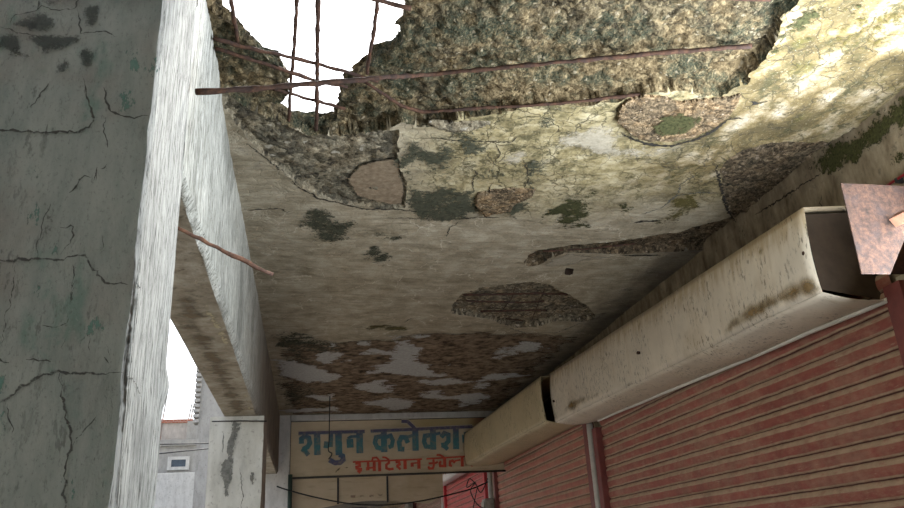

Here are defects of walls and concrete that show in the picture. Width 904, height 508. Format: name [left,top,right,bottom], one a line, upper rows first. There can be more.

water stain [0,6,78,56]
water stain [81,49,93,65]
water stain [84,6,98,26]
spalling [195,0,799,210]
spalling [524,123,861,267]
crack [0,78,149,508]
peeling [274,282,595,415]